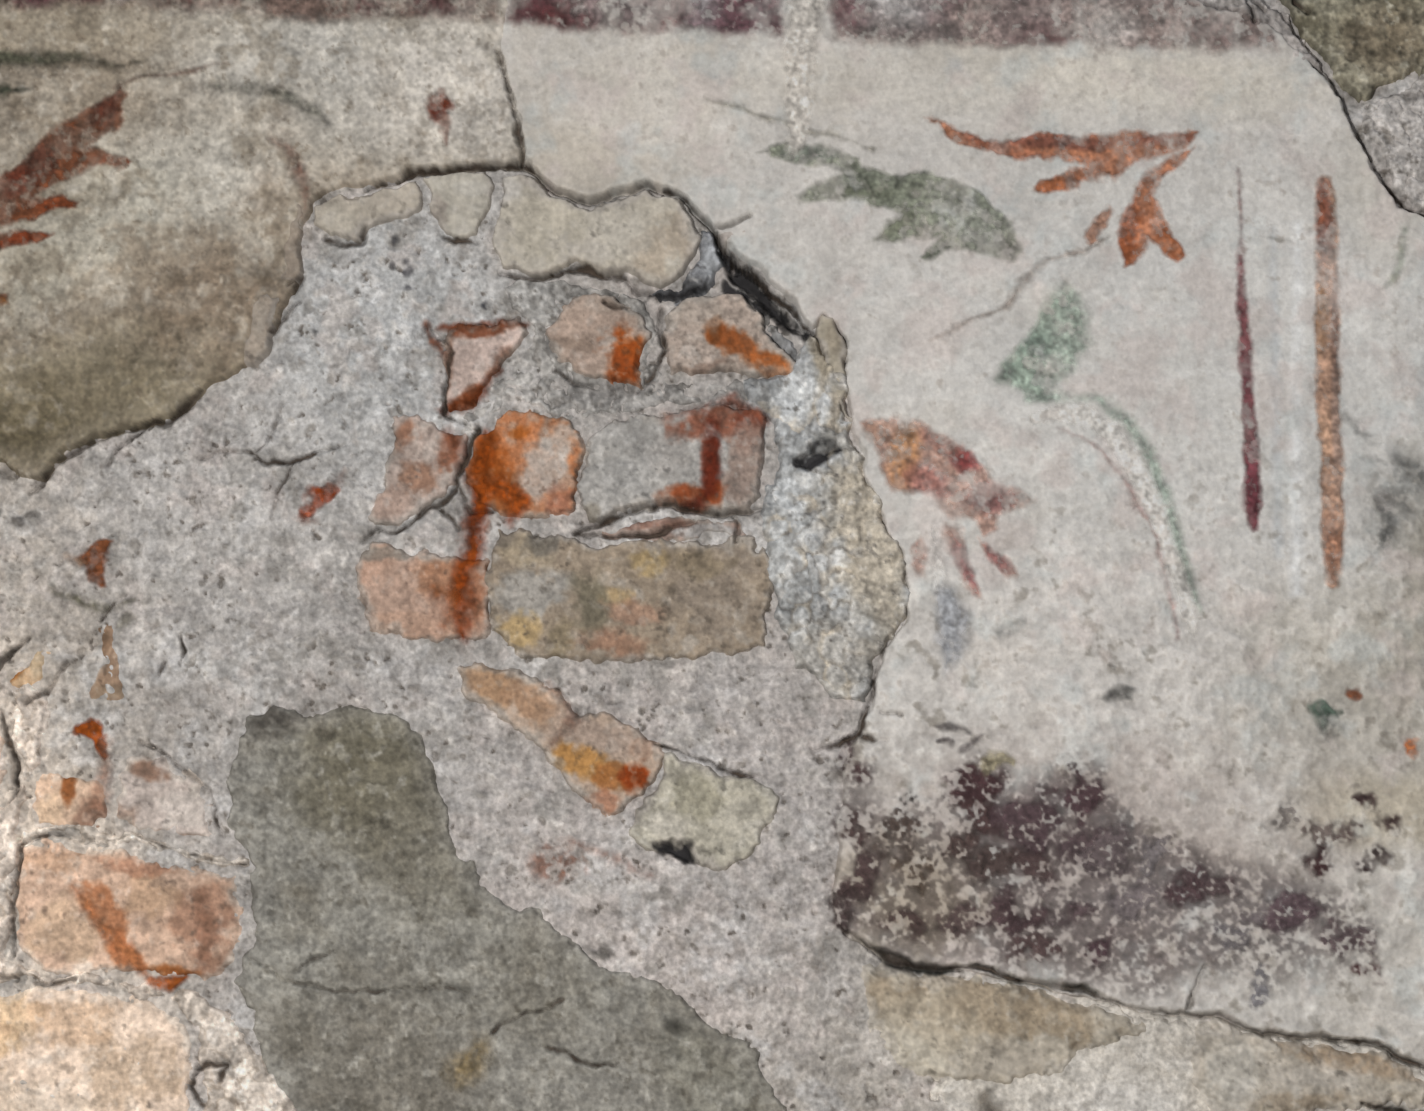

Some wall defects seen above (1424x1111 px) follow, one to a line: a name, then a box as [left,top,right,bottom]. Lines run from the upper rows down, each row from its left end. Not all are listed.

crack [377,126,535,188]
crack [444,236,472,244]
crack [509,264,639,308]
crack [751,273,811,334]
spalling [281,172,910,872]
spalling [89,624,124,701]
spalling [0,651,298,1111]
peeling [829,763,1238,958]
peeling [1272,807,1363,876]
peeling [1215,891,1376,975]
crack [951,965,1021,982]
crack [1282,1035,1424,1068]